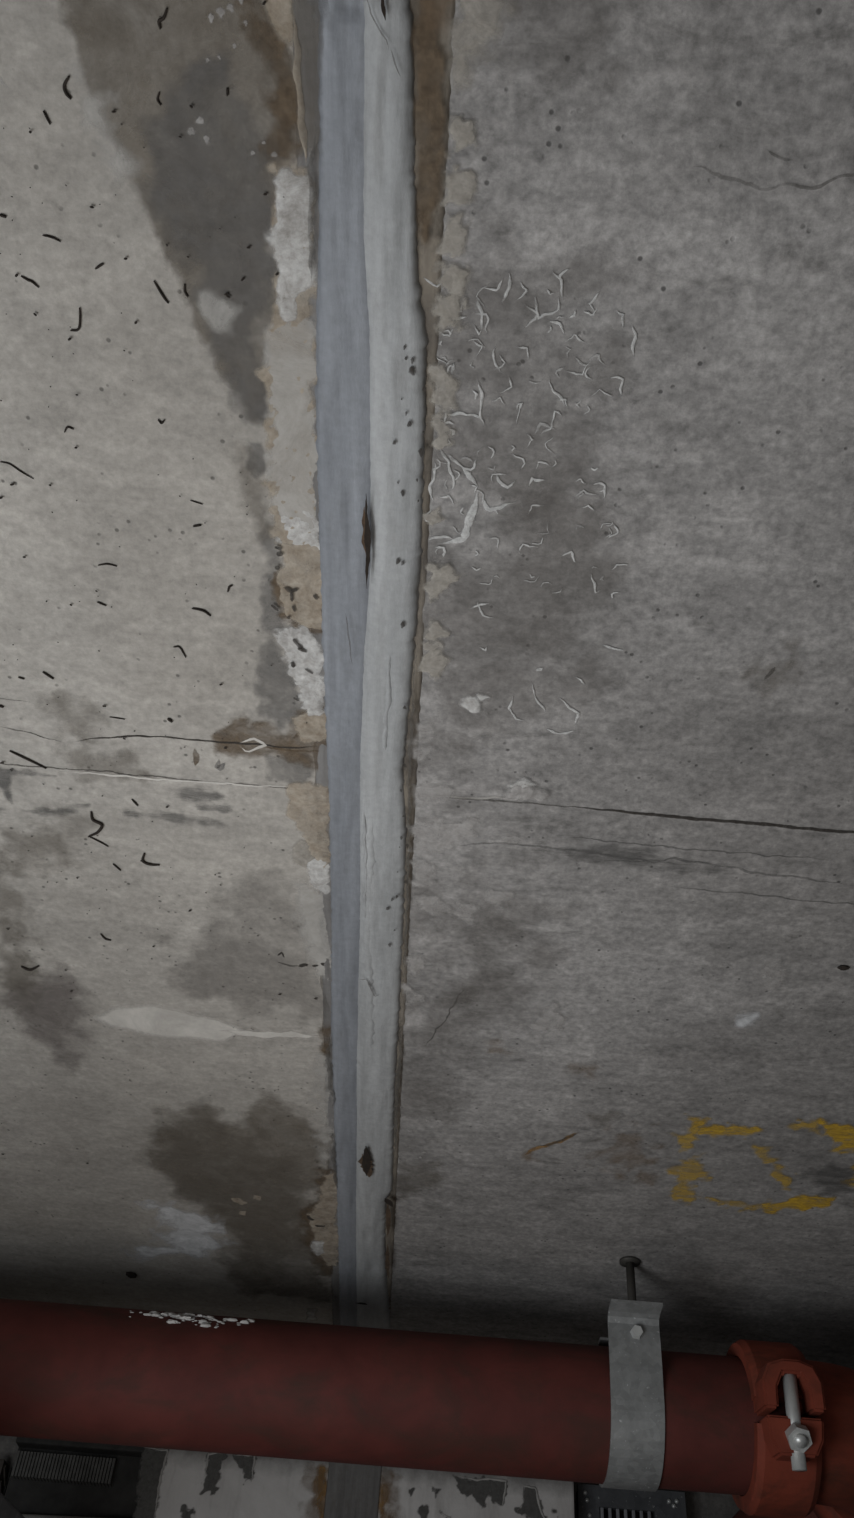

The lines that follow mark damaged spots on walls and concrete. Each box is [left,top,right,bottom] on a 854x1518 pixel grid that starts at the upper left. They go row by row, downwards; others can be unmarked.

damp [66,0,320,550]
damp [424,269,624,585]
spalling [271,587,318,619]
damp [562,551,627,598]
crack [6,699,308,752]
damp [532,668,580,734]
damp [97,1006,339,1320]
damp [129,1311,255,1328]
peeling [133,1447,169,1518]
peeling [180,1453,257,1518]
peeling [409,1476,556,1518]